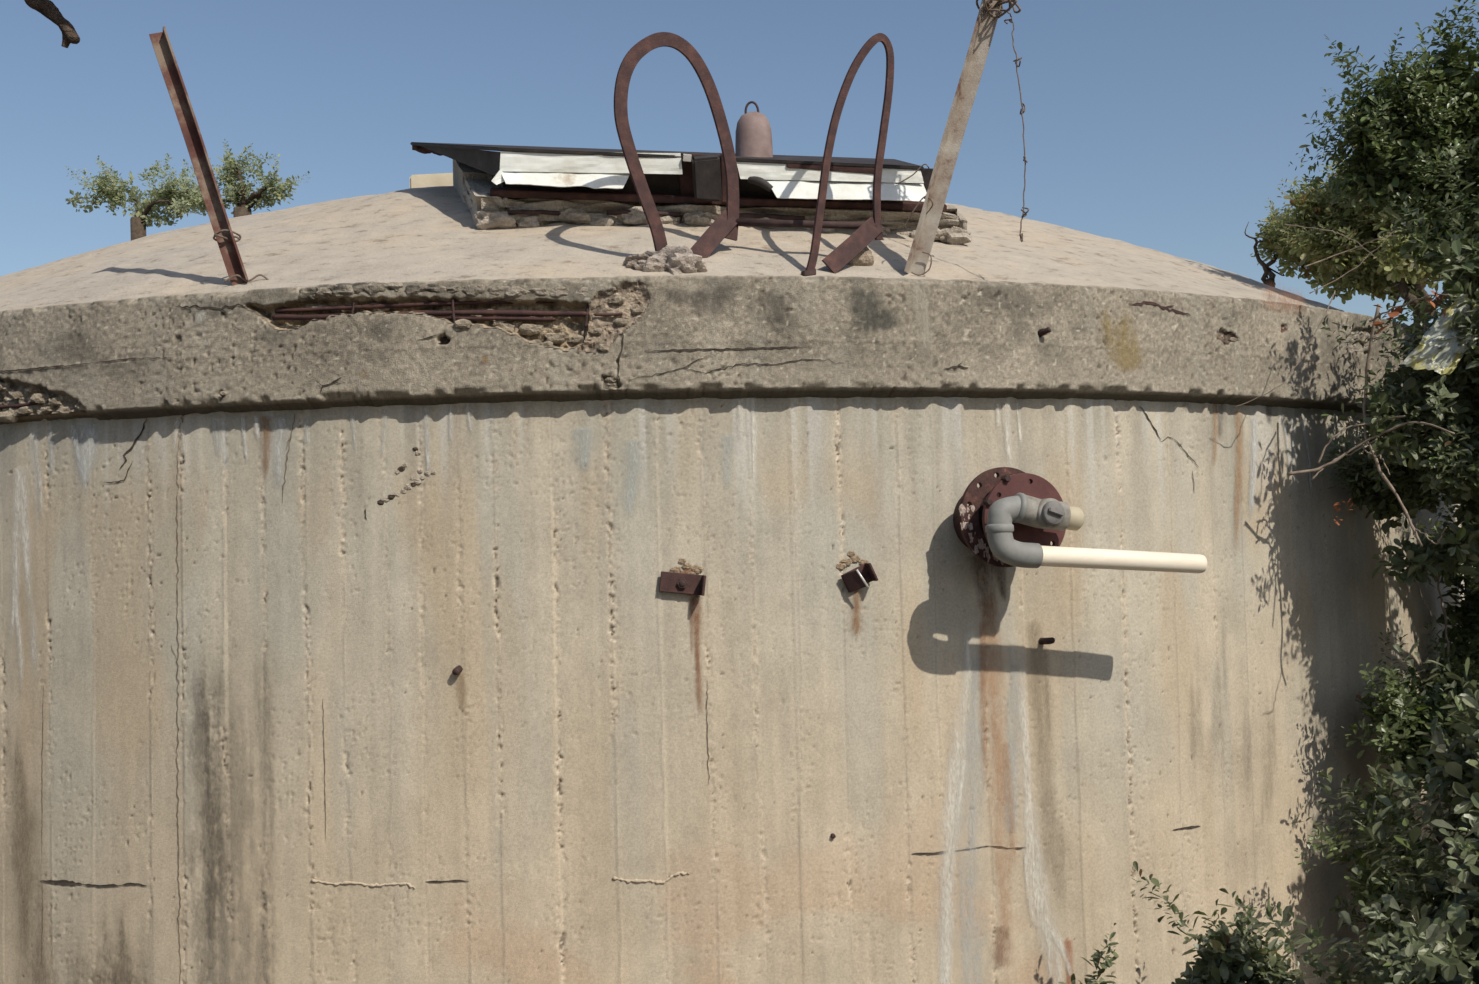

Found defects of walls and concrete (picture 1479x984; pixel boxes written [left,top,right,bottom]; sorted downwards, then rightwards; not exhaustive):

spalling [243,281,650,353]
spalling [0,378,86,423]
spalling [602,374,620,389]
crack [1141,407,1197,482]
corrosion [691,595,700,695]
crack [40,417,181,984]
crack [38,685,46,833]
crack [426,877,469,885]